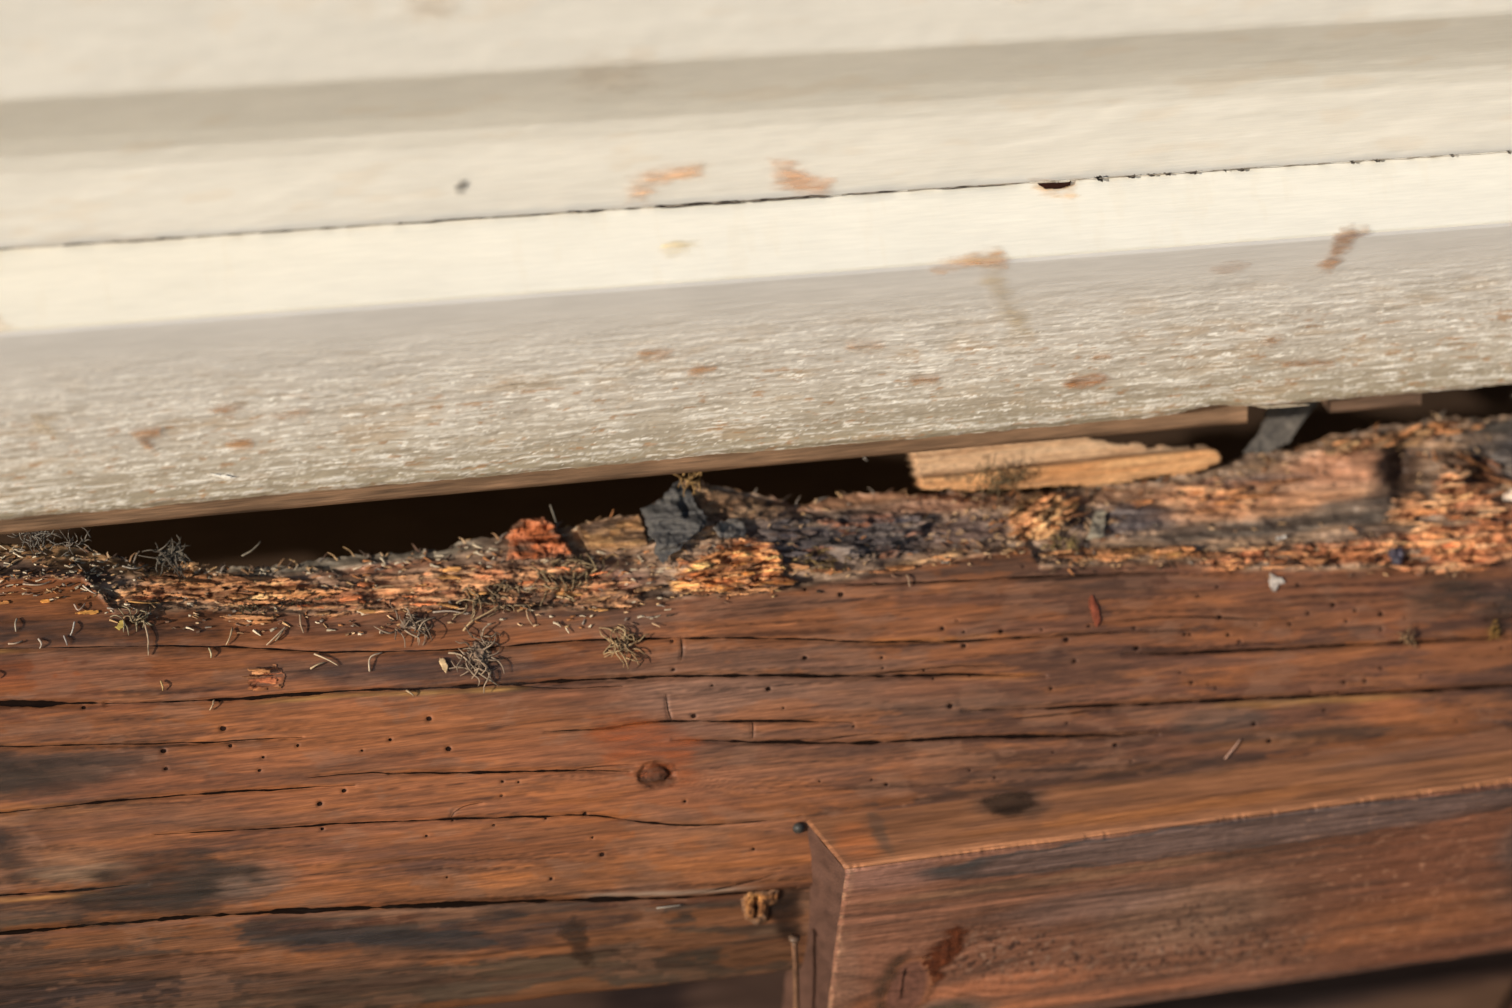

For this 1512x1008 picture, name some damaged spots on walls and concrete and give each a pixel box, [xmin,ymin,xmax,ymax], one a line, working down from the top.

peeling [1192,477,1308,506]
peeling [1330,423,1512,553]
peeling [132,566,463,624]
peeling [519,566,609,612]
peeling [633,518,859,596]
crack [831,571,1180,585]
peeling [1010,493,1227,562]
peeling [1242,545,1410,592]
peeling [242,668,271,679]
crack [0,616,1512,835]
water stain [73,850,258,914]
crack [0,874,795,935]